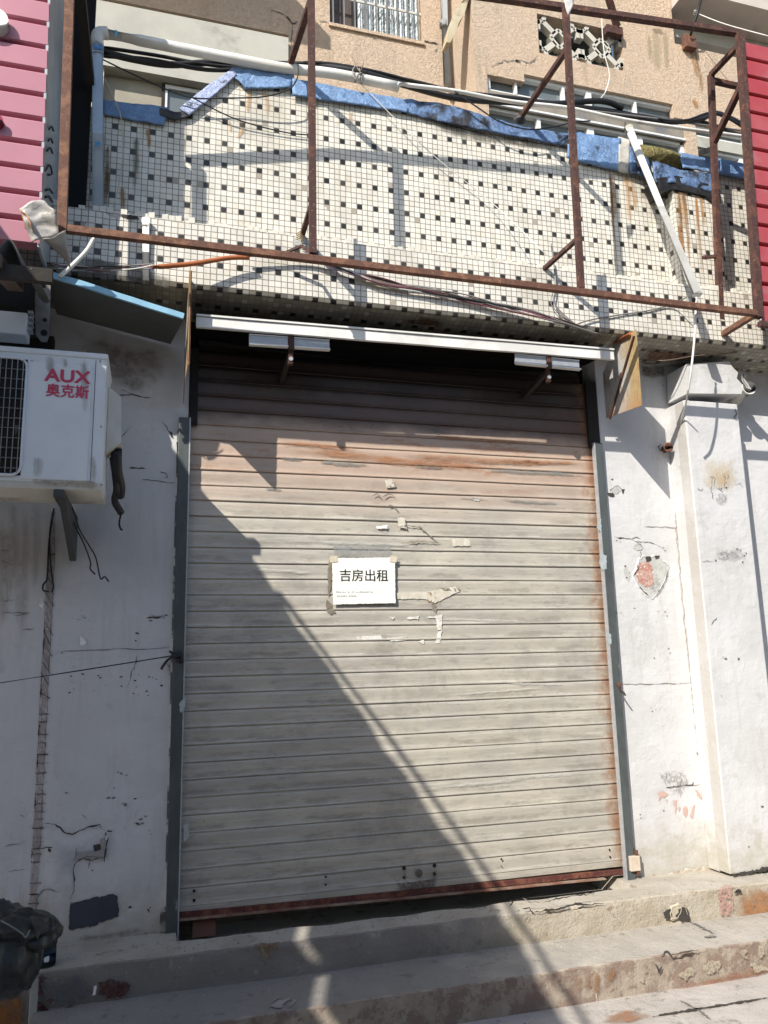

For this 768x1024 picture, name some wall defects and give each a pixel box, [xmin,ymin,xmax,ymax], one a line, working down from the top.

corrosion [609,175,636,235]
corrosion [678,194,704,250]
spalling [624,543,670,616]
peeling [658,773,702,819]
crack [661,772,700,797]
crack [5,815,112,909]
crack [509,888,603,920]
peeling [678,960,721,980]
peeling [740,946,768,973]